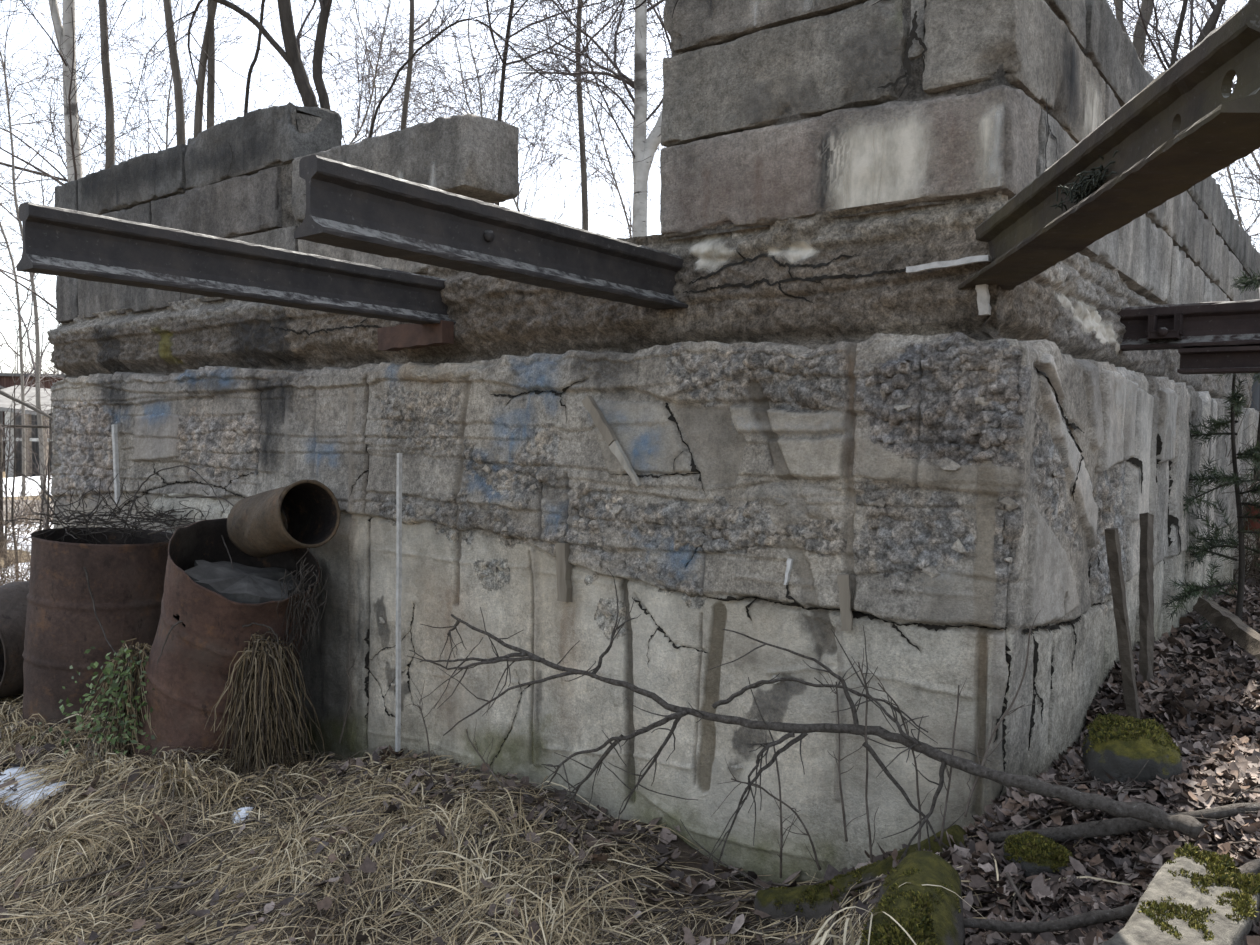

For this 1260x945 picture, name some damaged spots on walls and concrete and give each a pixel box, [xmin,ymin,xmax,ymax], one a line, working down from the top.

crack [878,11,928,97]
crack [609,403,704,491]
spalling [370,380,977,610]
spalling [664,332,1127,616]
spalling [594,598,627,641]
crack [709,557,1110,793]